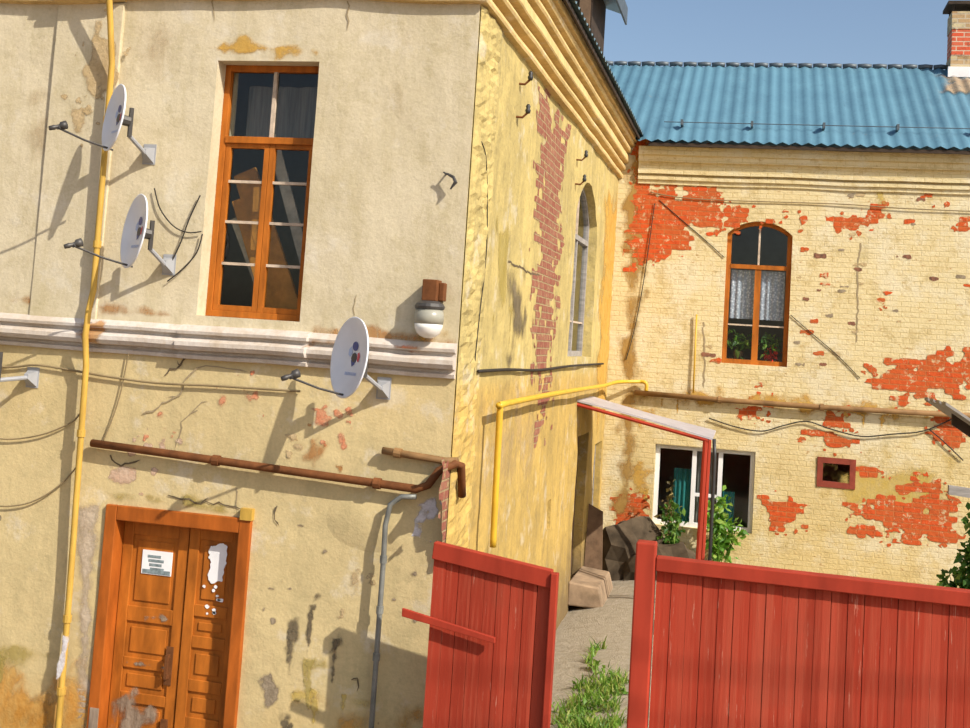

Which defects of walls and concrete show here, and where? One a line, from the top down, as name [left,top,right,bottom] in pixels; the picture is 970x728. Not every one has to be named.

flaking render [61,9,131,147]
flaking render [529,86,571,448]
flaking render [623,139,756,273]
flaking render [825,193,892,251]
spalling [794,314,833,344]
crack [141,359,247,447]
flaking render [797,405,862,456]
flaking render [861,346,970,452]
flaking render [757,490,808,536]
flaking render [842,466,966,548]
leakage [0,505,99,728]
leakage [286,605,318,723]